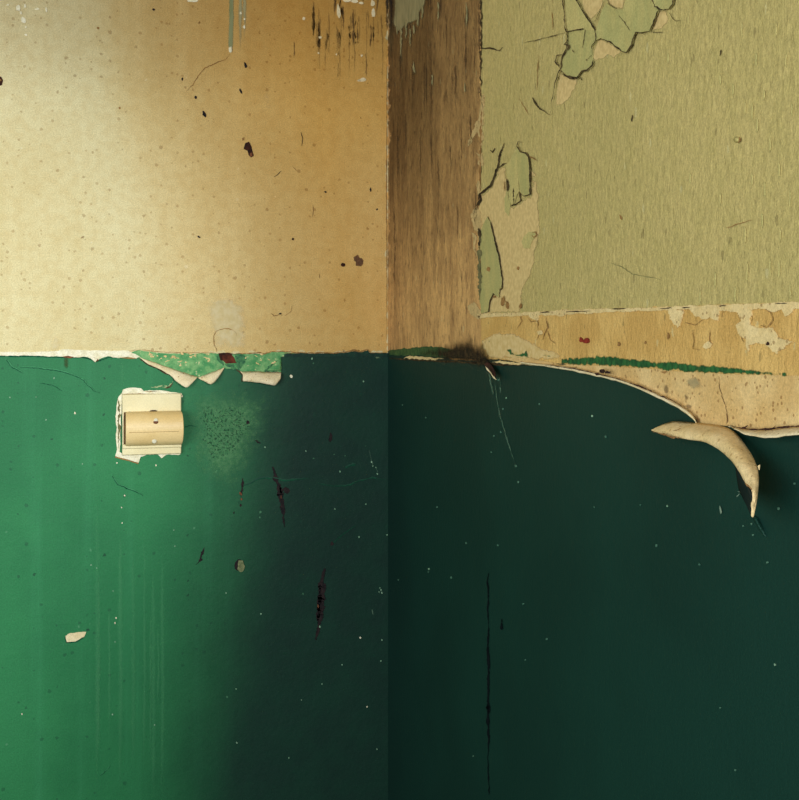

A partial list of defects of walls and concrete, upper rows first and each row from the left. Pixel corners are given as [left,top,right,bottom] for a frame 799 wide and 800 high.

peeling [467,0,799,354]
peeling [0,333,799,517]
leakage [432,341,490,365]
spalling [65,632,86,643]
crack [484,573,492,792]